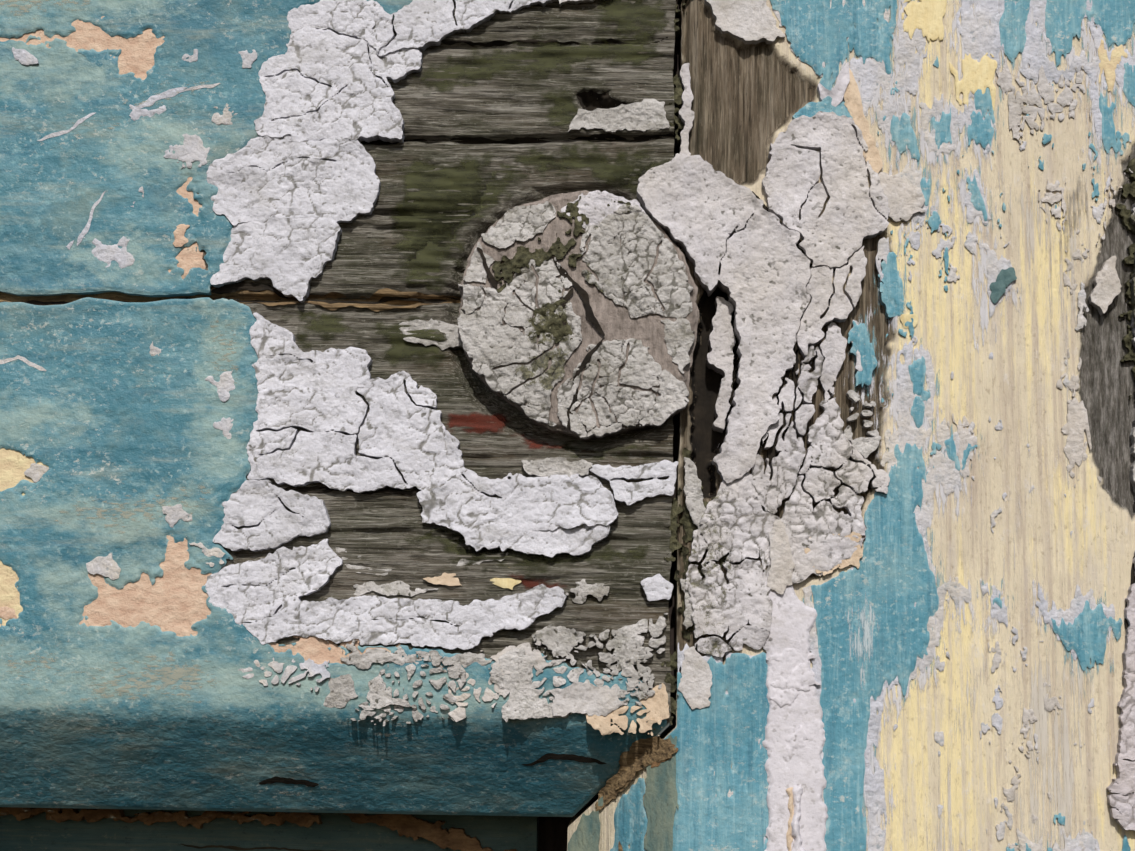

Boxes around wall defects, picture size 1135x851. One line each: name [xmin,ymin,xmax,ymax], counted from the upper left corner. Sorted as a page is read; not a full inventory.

peeling [0,0,165,80]
crack [441,37,668,47]
crack [705,0,785,45]
peeling [109,81,208,129]
peeling [568,90,670,134]
peeling [163,0,595,303]
peeling [66,236,135,269]
crack [362,63,925,709]
peeling [817,0,1135,851]
peeling [0,448,49,496]
peeling [55,287,740,736]
peeling [0,561,23,627]